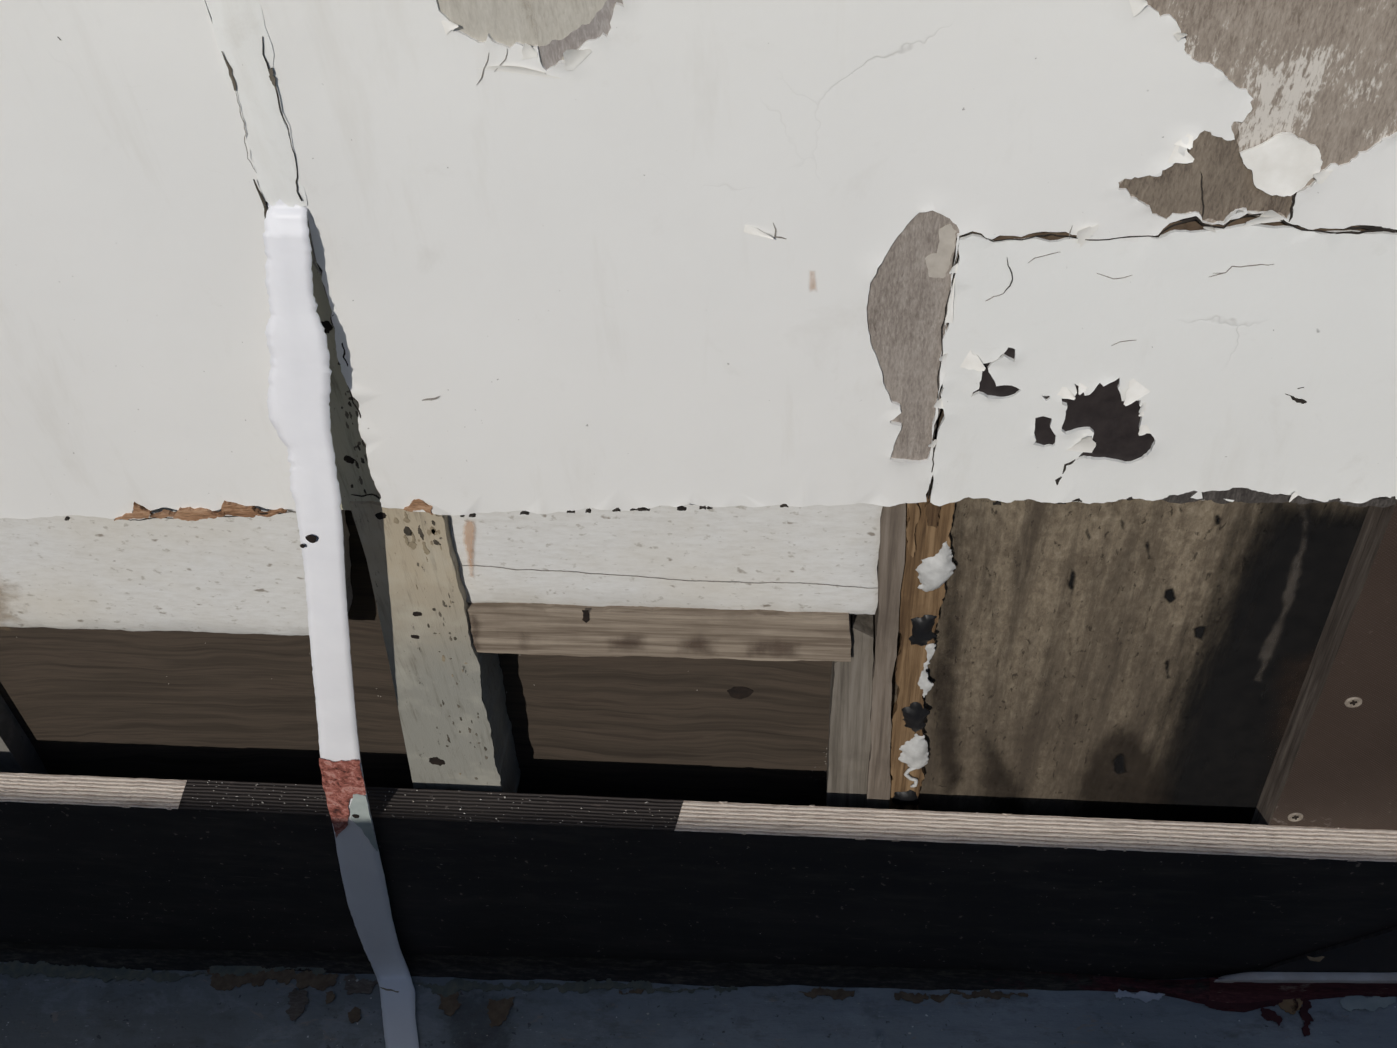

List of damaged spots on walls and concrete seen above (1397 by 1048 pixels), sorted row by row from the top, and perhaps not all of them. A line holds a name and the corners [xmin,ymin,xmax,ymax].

peeling [437,0,623,71]
peeling [1118,0,1397,225]
crack [221,37,366,449]
peeling [867,210,1020,460]
peeling [1034,378,1154,485]
crack [927,213,1397,499]
water stain [934,601,958,785]
water stain [986,753,1020,815]
water stain [1082,499,1369,824]